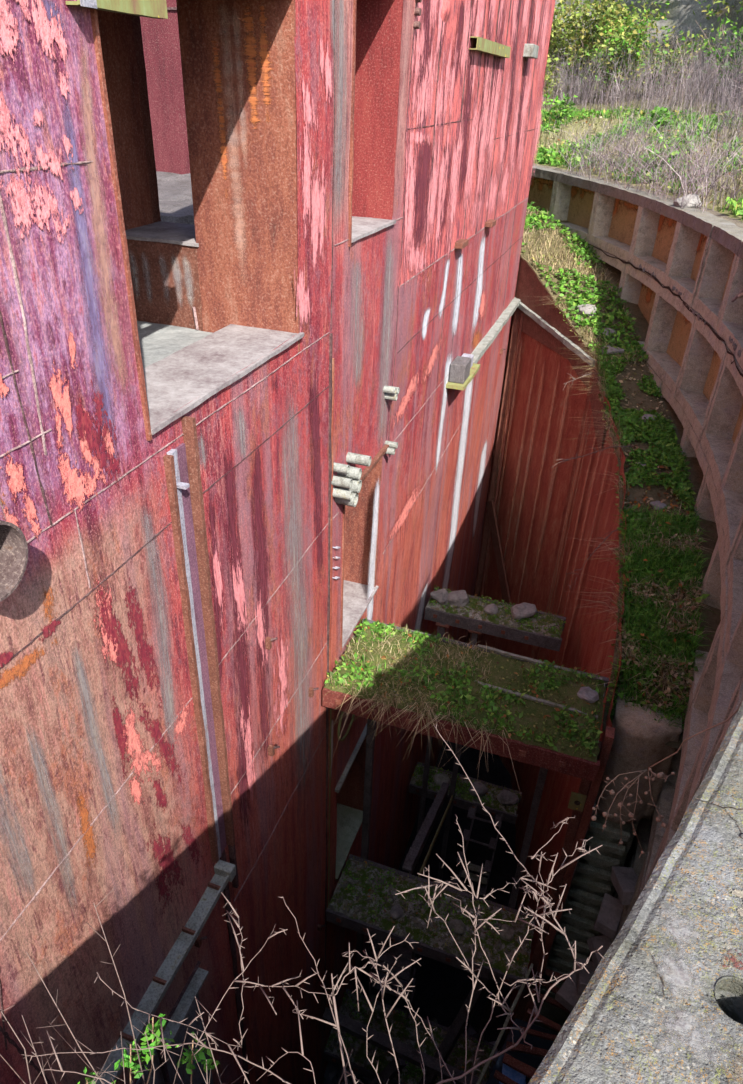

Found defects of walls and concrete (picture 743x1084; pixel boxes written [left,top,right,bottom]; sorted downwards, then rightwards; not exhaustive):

peeling [0,0,71,104]
peeling [0,76,84,246]
rust [211,41,228,179]
rust [242,6,273,129]
peeling [0,373,9,398]
peeling [47,332,132,515]
rust [0,636,57,689]
peeling [89,561,203,914]
rust [77,792,96,866]